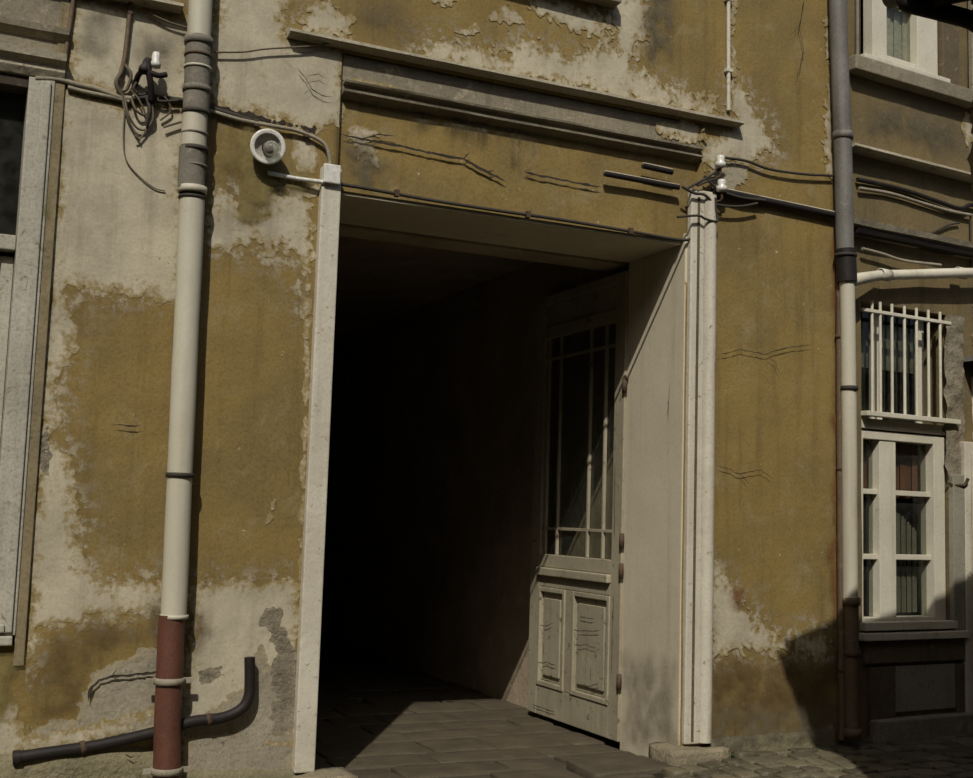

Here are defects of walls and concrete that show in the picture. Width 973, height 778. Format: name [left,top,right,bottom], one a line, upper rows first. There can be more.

crack [342,134,600,187]
peeling [399,0,785,190]
peeling [25,0,188,687]
peeling [203,0,398,525]
peeling [0,702,154,754]
crack [88,669,156,702]
peeling [181,538,303,746]
peeling [713,560,836,672]